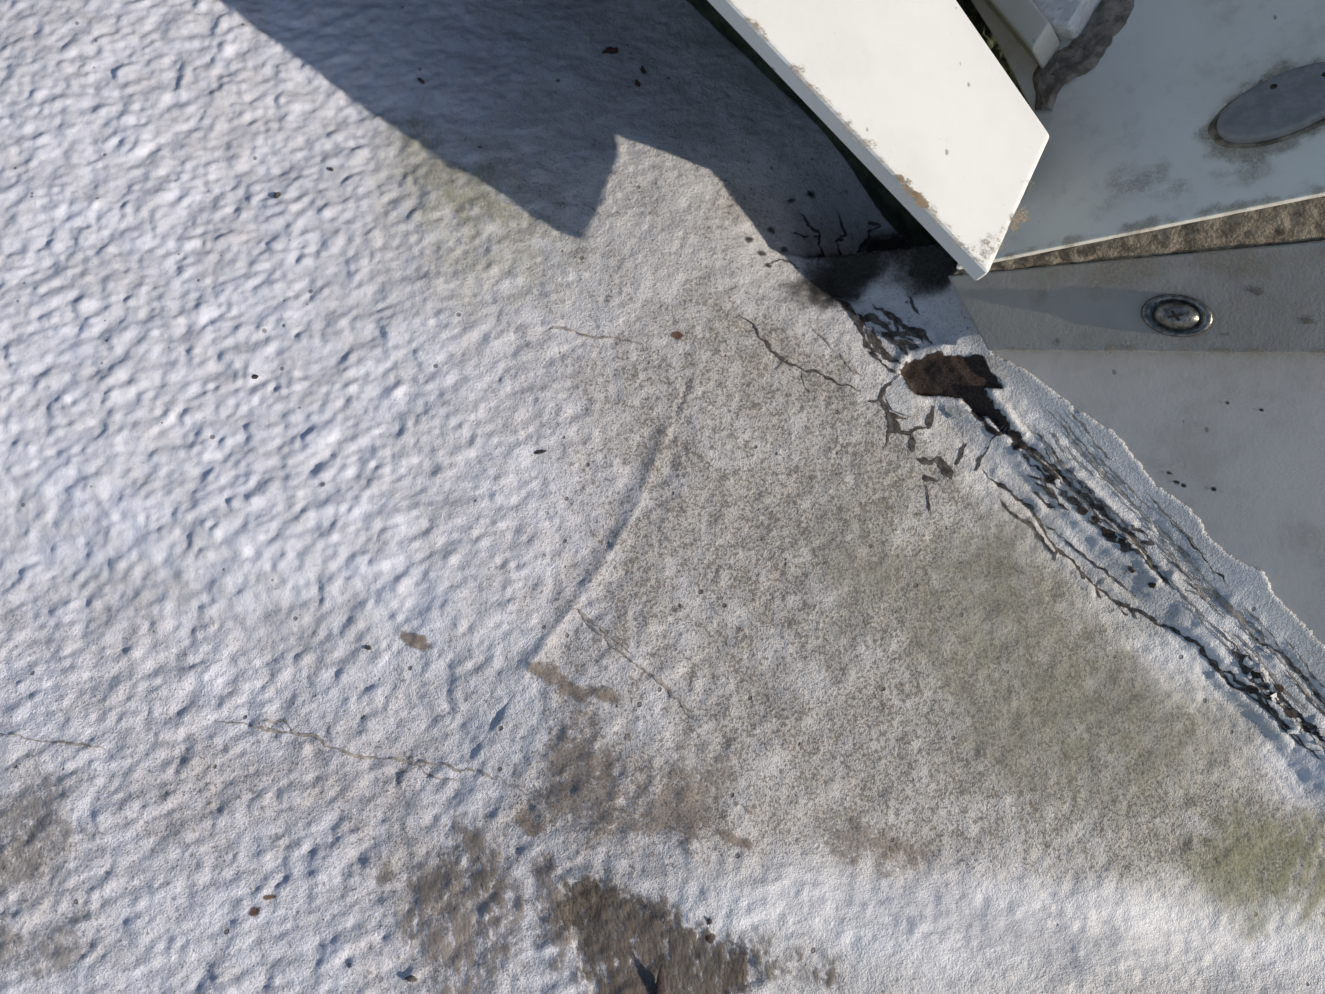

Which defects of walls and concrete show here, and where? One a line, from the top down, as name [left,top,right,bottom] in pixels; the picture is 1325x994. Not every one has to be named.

peeling [884,351,1034,454]
crack [730,295,1325,761]
crack [0,733,106,750]
crack [208,718,517,789]
peeling [1231,649,1325,750]
damp [0,917,83,977]
damp [453,816,503,934]
damp [532,854,576,974]